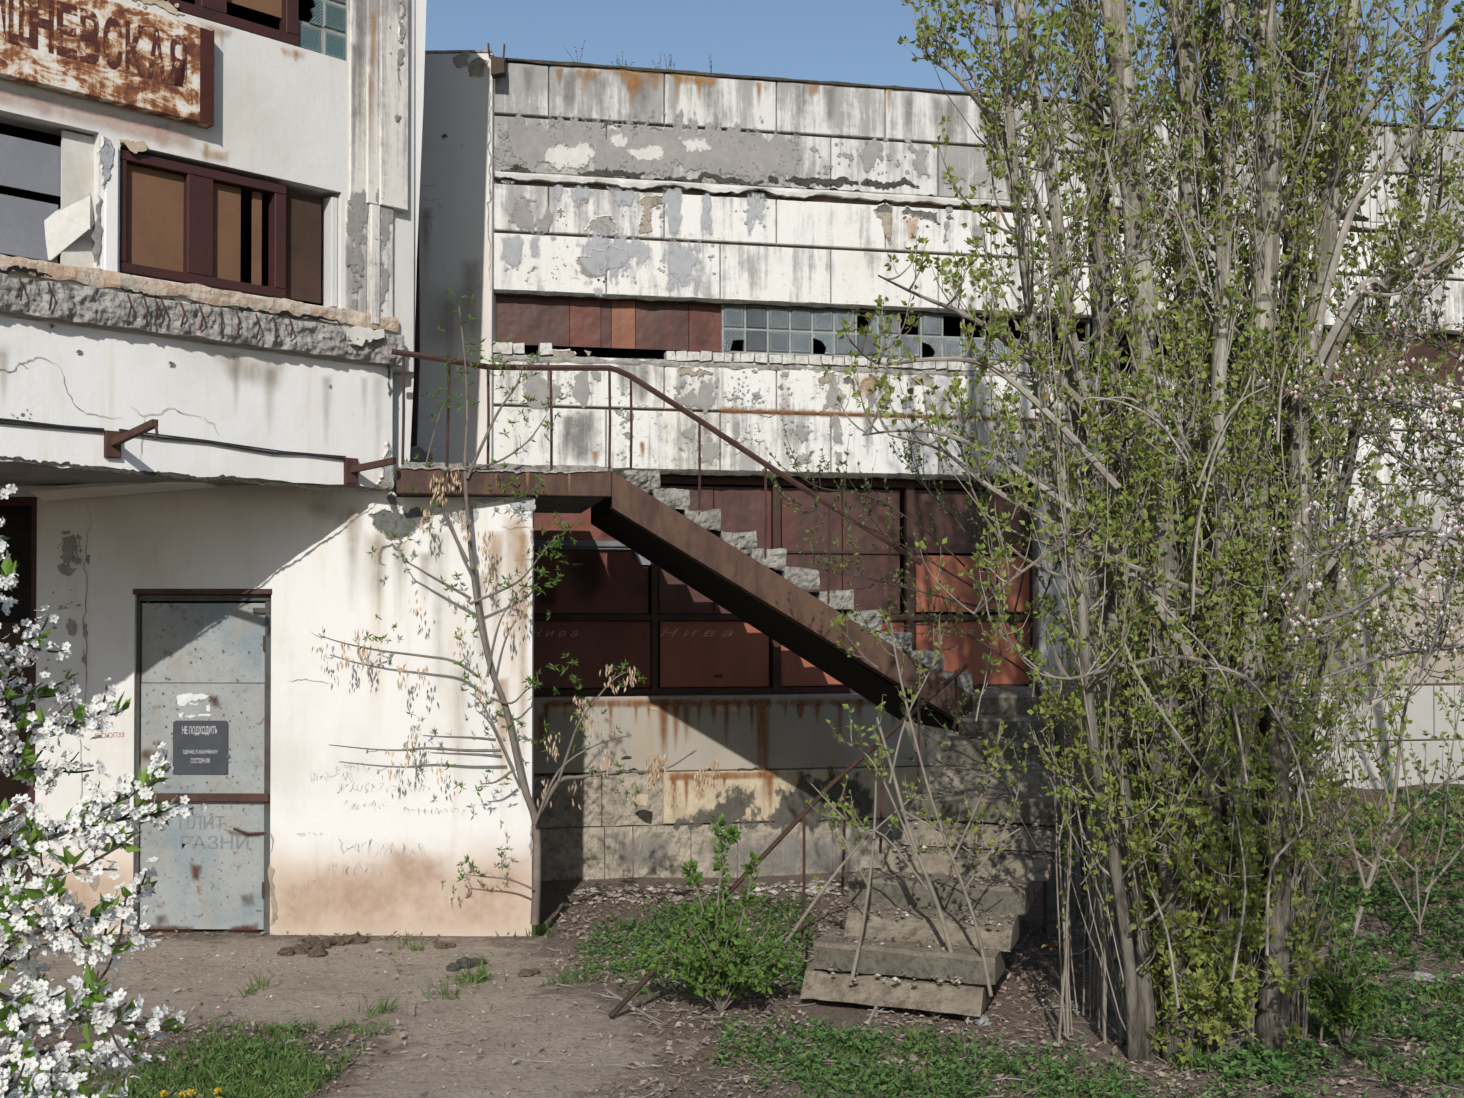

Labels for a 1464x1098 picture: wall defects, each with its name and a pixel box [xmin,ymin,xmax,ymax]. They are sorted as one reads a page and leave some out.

rust [98,115,187,143]
peeling [346,189,394,311]
peeling [494,109,989,296]
spalling [127,294,293,342]
crack [0,357,217,467]
peeling [522,349,601,409]
peeling [673,366,879,466]
spalling [0,387,634,565]
flaking render [451,496,536,590]
peeling [45,531,90,689]
rust [539,699,871,799]
leakage [625,766,874,871]